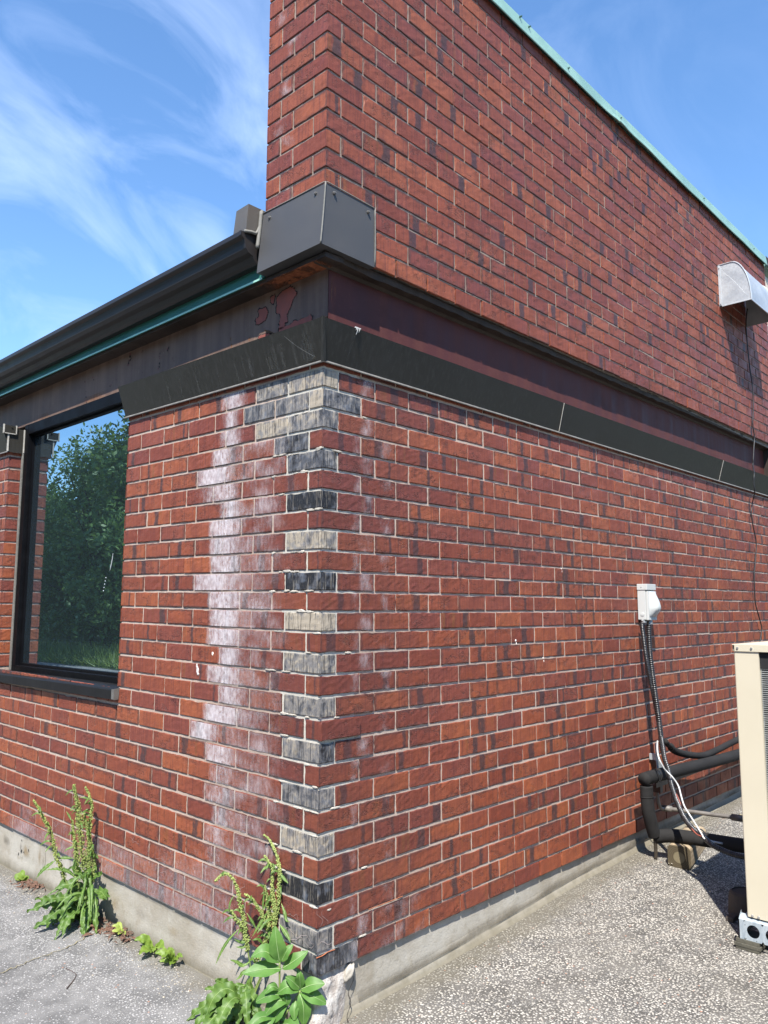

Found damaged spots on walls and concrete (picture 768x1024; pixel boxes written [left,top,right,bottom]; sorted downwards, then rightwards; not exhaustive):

peeling [255,285,313,339]
water stain [193,396,237,764]